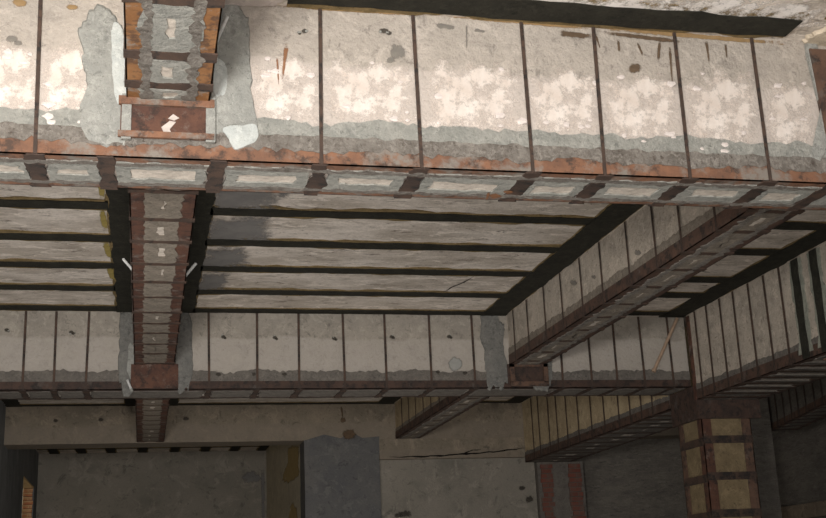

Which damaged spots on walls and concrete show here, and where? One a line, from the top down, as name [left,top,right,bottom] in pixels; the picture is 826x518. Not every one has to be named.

rust [485,20,600,47]
rust [276,48,288,84]
damp [387,44,405,62]
rust [609,28,783,81]
damp [199,191,288,290]